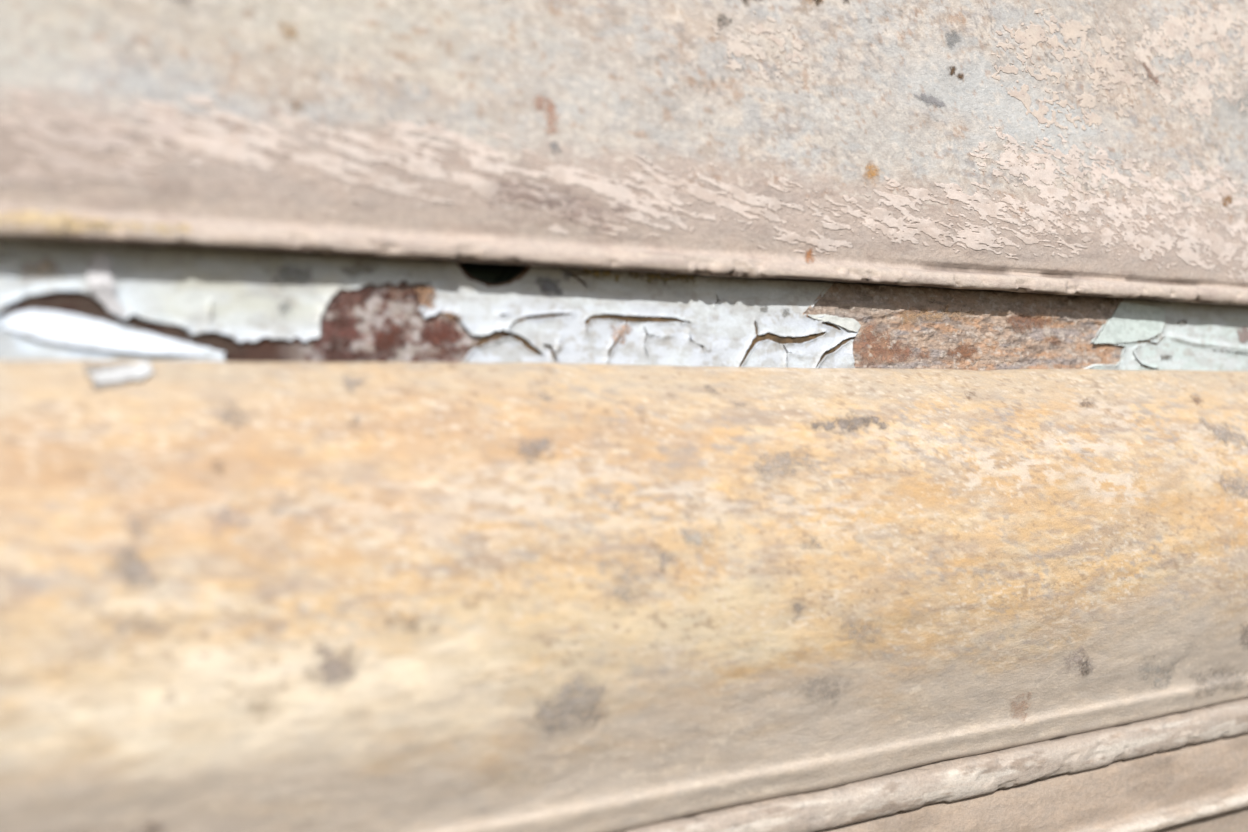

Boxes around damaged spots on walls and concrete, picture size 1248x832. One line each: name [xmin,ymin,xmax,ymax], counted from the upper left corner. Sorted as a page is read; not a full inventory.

peeling [120,0,1248,287]
peeling [0,251,507,390]
rust [313,284,506,362]
crack [500,270,702,361]
crack [739,322,854,367]
rust [853,325,929,364]
rust [948,344,977,357]